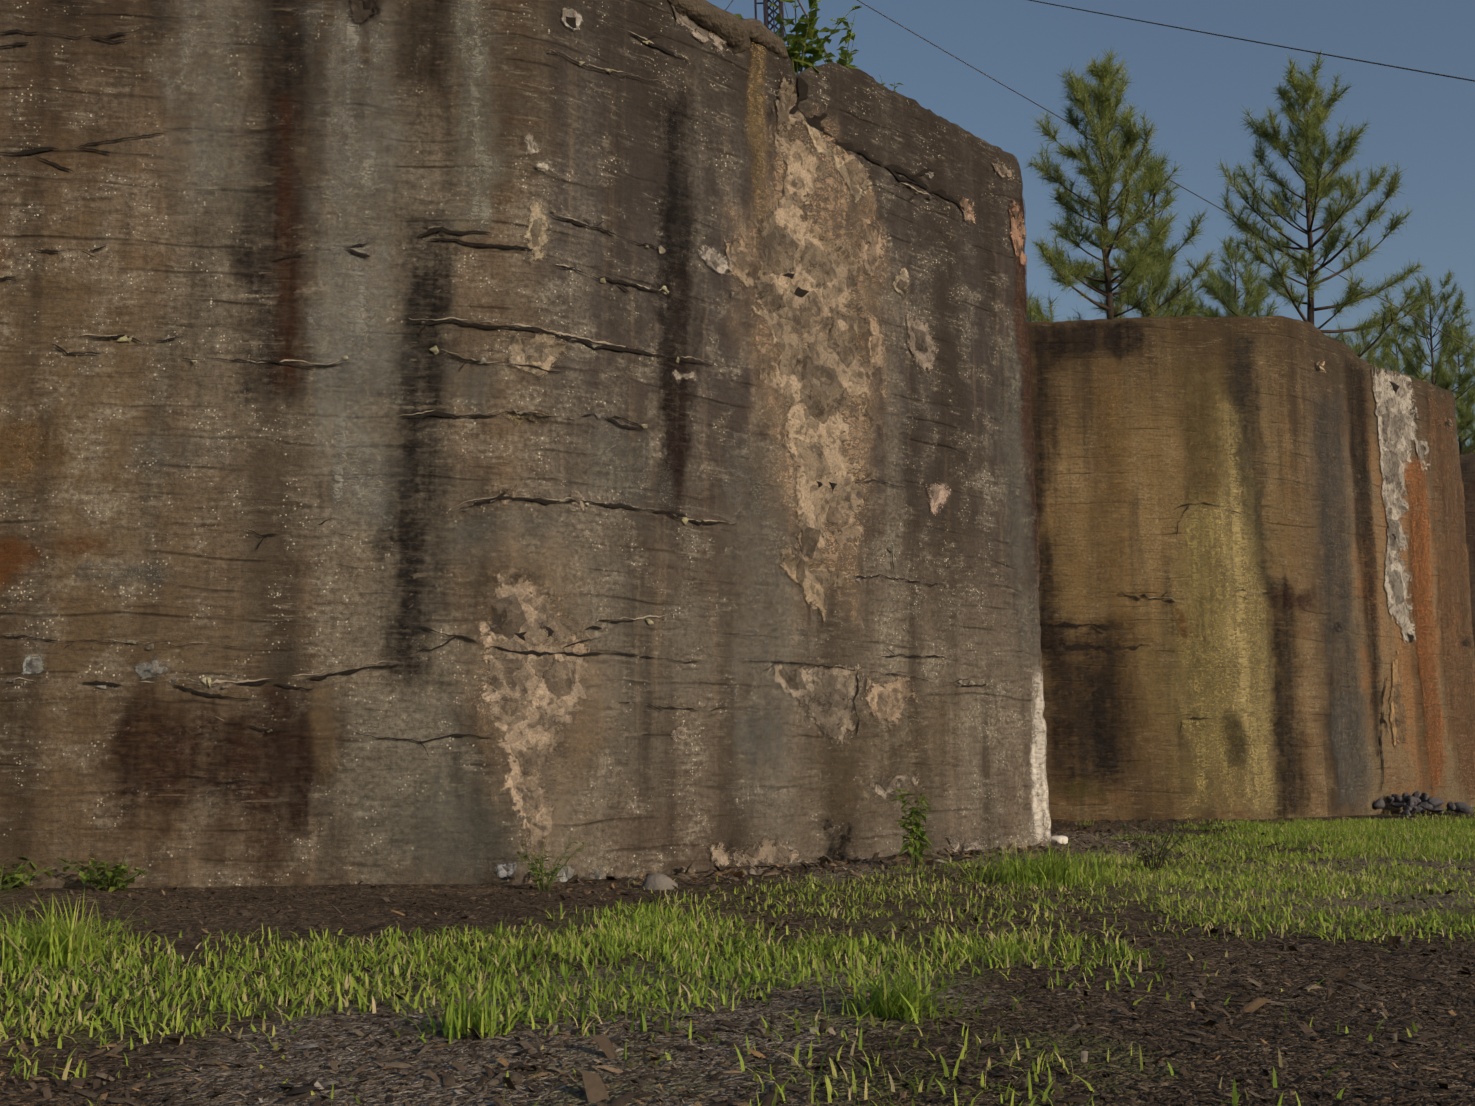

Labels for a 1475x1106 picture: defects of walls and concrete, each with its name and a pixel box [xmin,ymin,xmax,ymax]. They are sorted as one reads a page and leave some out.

crack [0,133,163,171]
damp [411,0,497,224]
damp [234,0,451,682]
crack [0,615,697,735]
crack [399,408,654,433]
spalling [477,568,603,883]
crack [408,317,713,374]
spalling [698,71,910,624]
spalling [774,659,919,747]
damp [1003,321,1144,648]
damp [1180,338,1311,819]
spalling [1372,367,1430,748]